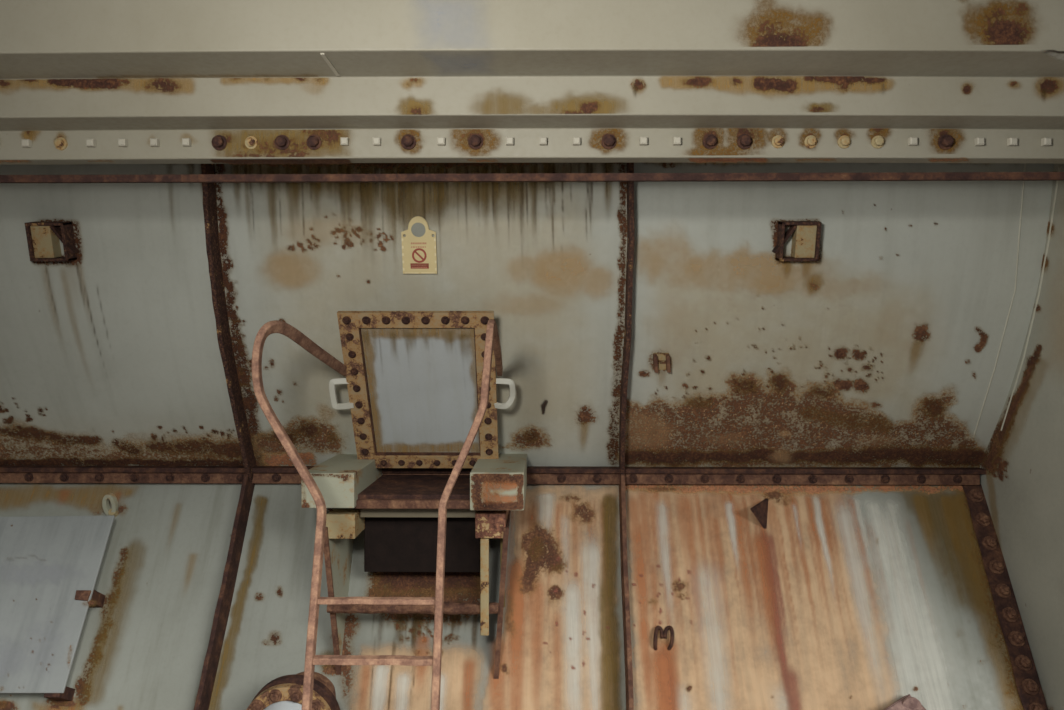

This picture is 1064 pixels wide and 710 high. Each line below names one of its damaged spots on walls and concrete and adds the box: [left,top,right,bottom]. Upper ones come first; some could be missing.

corrosion [746,0,829,47]
corrosion [964,1,1034,45]
corrosion [0,78,193,94]
corrosion [482,95,619,114]
corrosion [661,76,891,112]
water stain [238,163,592,221]
corrosion [0,129,530,483]
corrosion [577,128,1042,481]
corrosion [471,474,524,510]
corrosion [517,525,577,602]
corrosion [46,548,128,710]
corrosion [367,572,492,654]